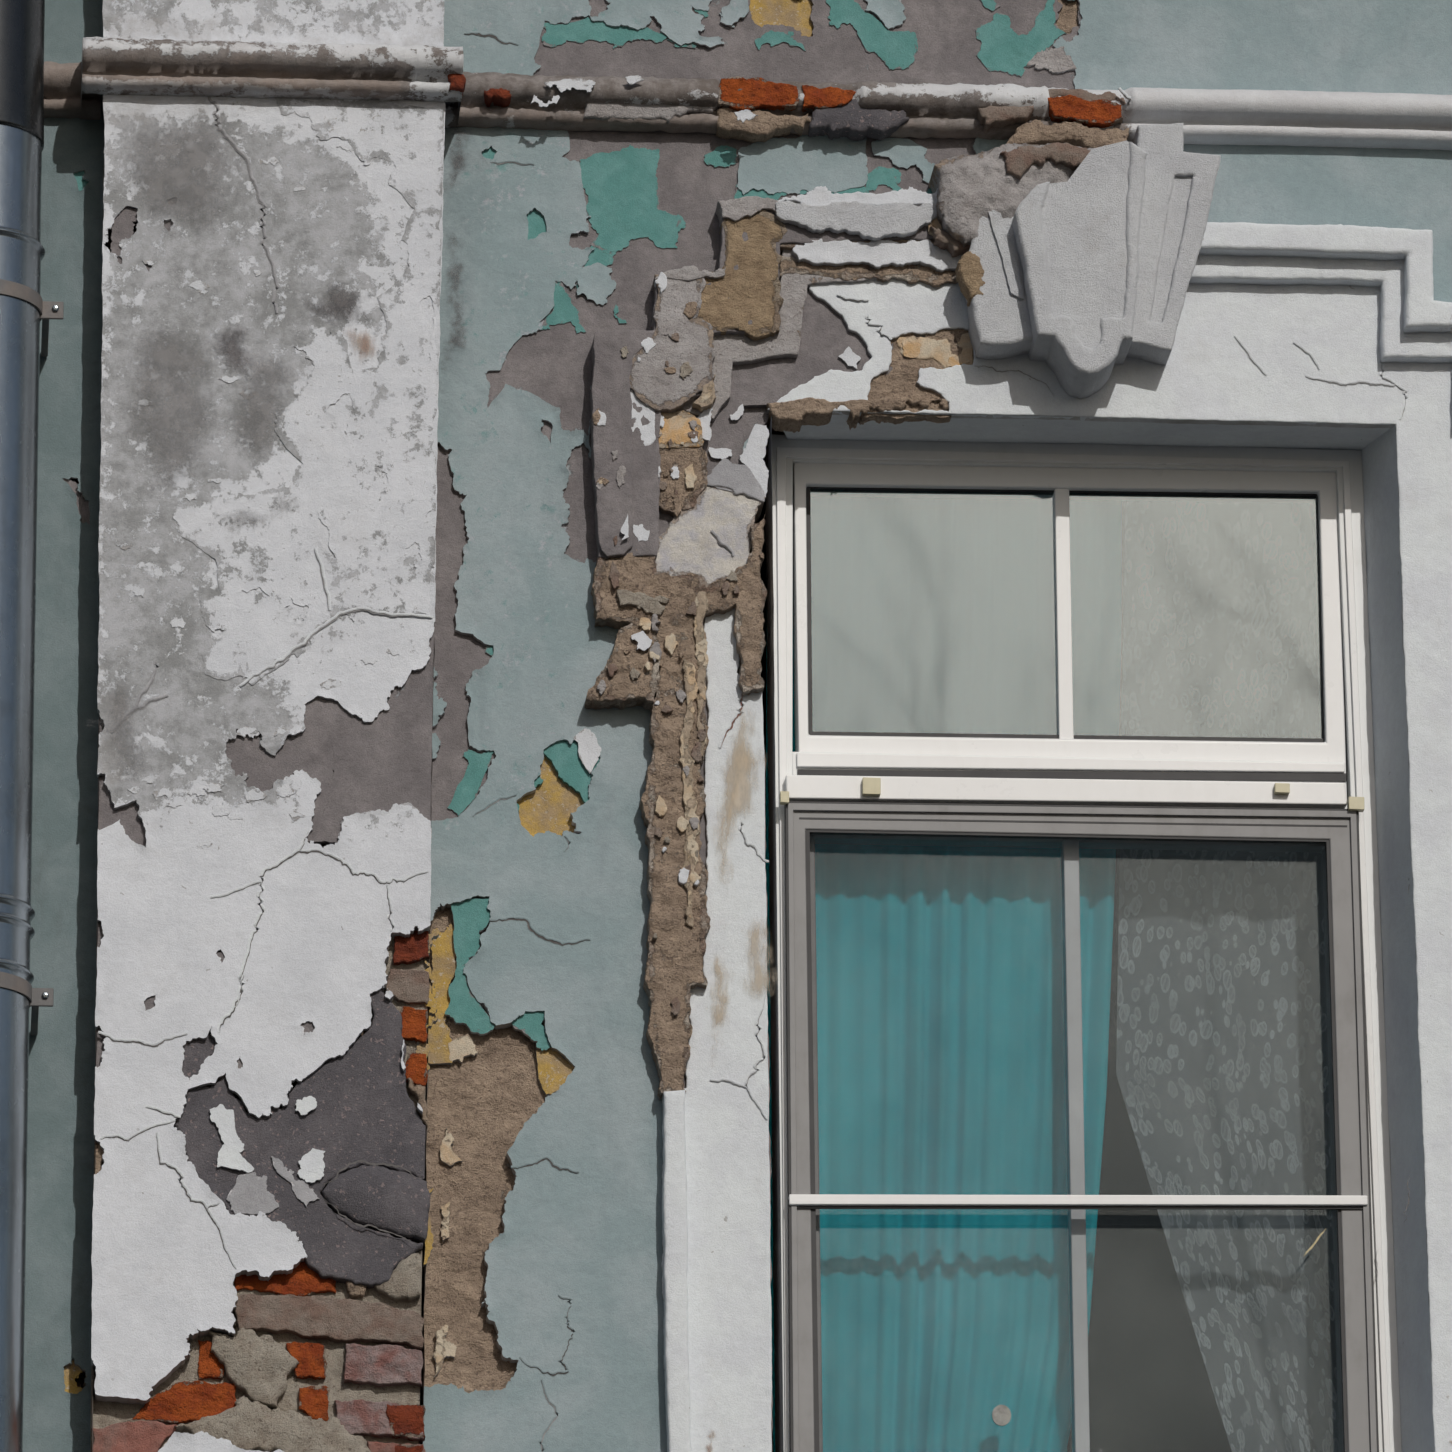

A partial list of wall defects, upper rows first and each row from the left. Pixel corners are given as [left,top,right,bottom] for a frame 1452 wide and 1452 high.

peeling [531,0,1082,108]
crack [208,96,279,313]
crack [1293,341,1408,419]
peeling [98,97,497,847]
crack [240,548,433,687]
peeling [486,109,1106,1100]
crack [98,749,428,1047]
crack [738,821,769,863]
crack [710,996,769,1120]
crack [99,1105,237,1269]
flaking render [64,898,574,1452]
crack [519,1294,576,1452]